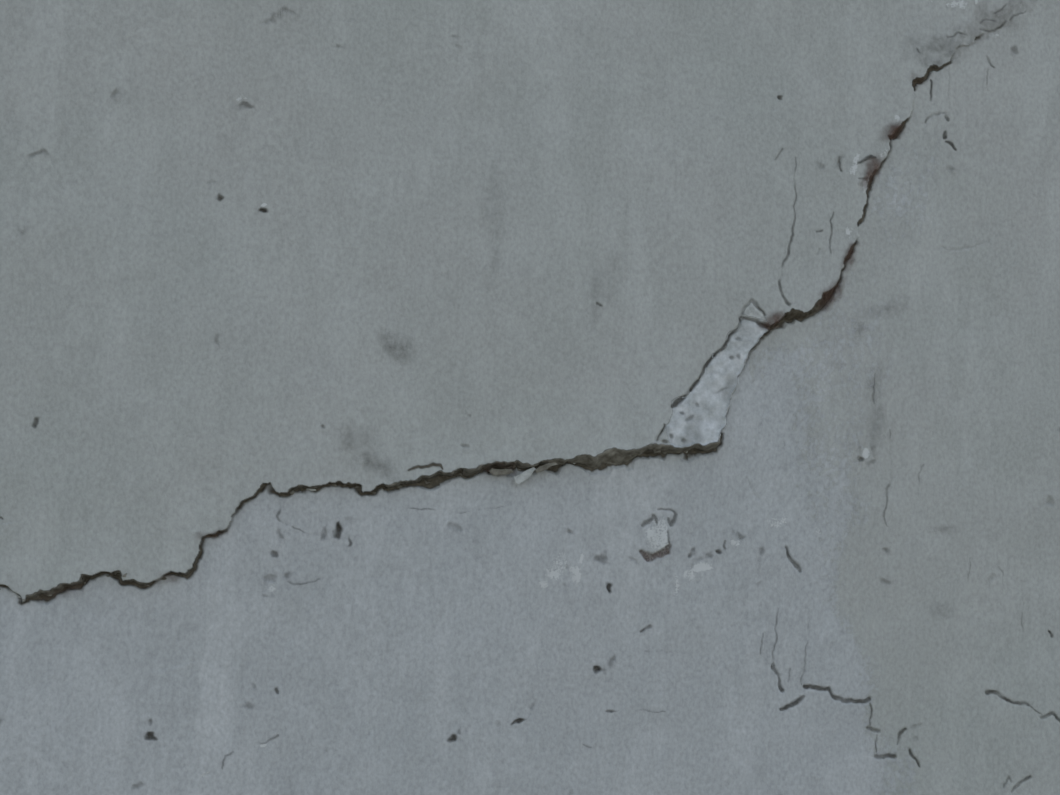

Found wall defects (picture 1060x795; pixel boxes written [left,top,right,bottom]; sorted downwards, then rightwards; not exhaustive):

crack [912,60,951,97]
crack [943,119,956,150]
crack [750,118,909,351]
peeling [0,114,962,795]
crack [0,433,723,604]
crack [780,685,872,710]
crack [985,691,1060,721]
crack [875,728,920,767]